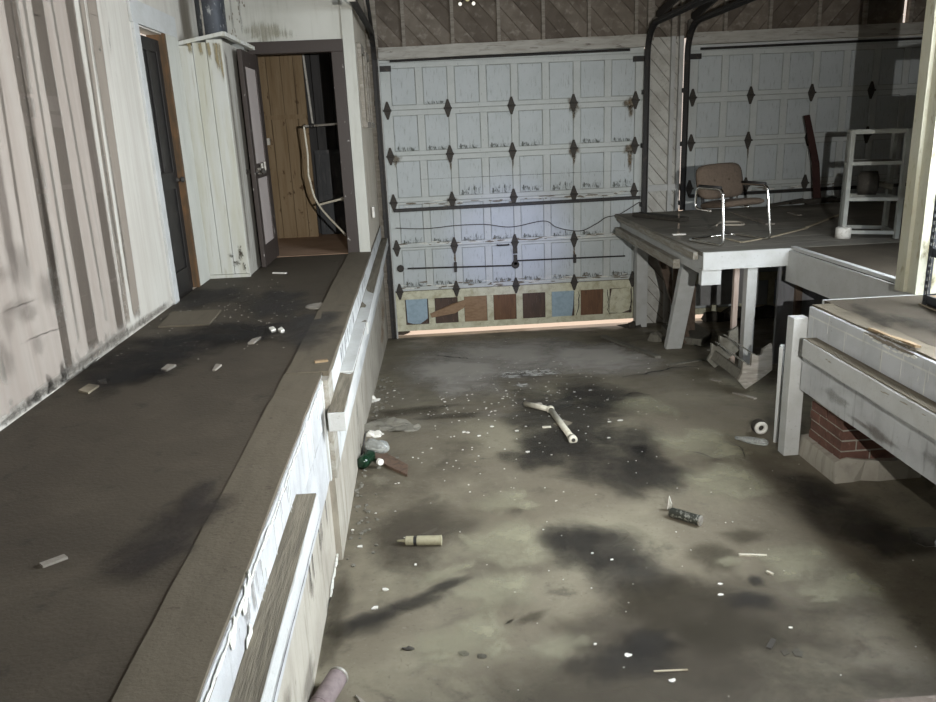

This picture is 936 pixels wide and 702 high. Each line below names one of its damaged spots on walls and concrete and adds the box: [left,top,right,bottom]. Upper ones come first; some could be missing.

water stain [0,0,140,419]
spalling [863,331,921,359]
peeling [204,384,322,702]
spalling [326,554,338,623]